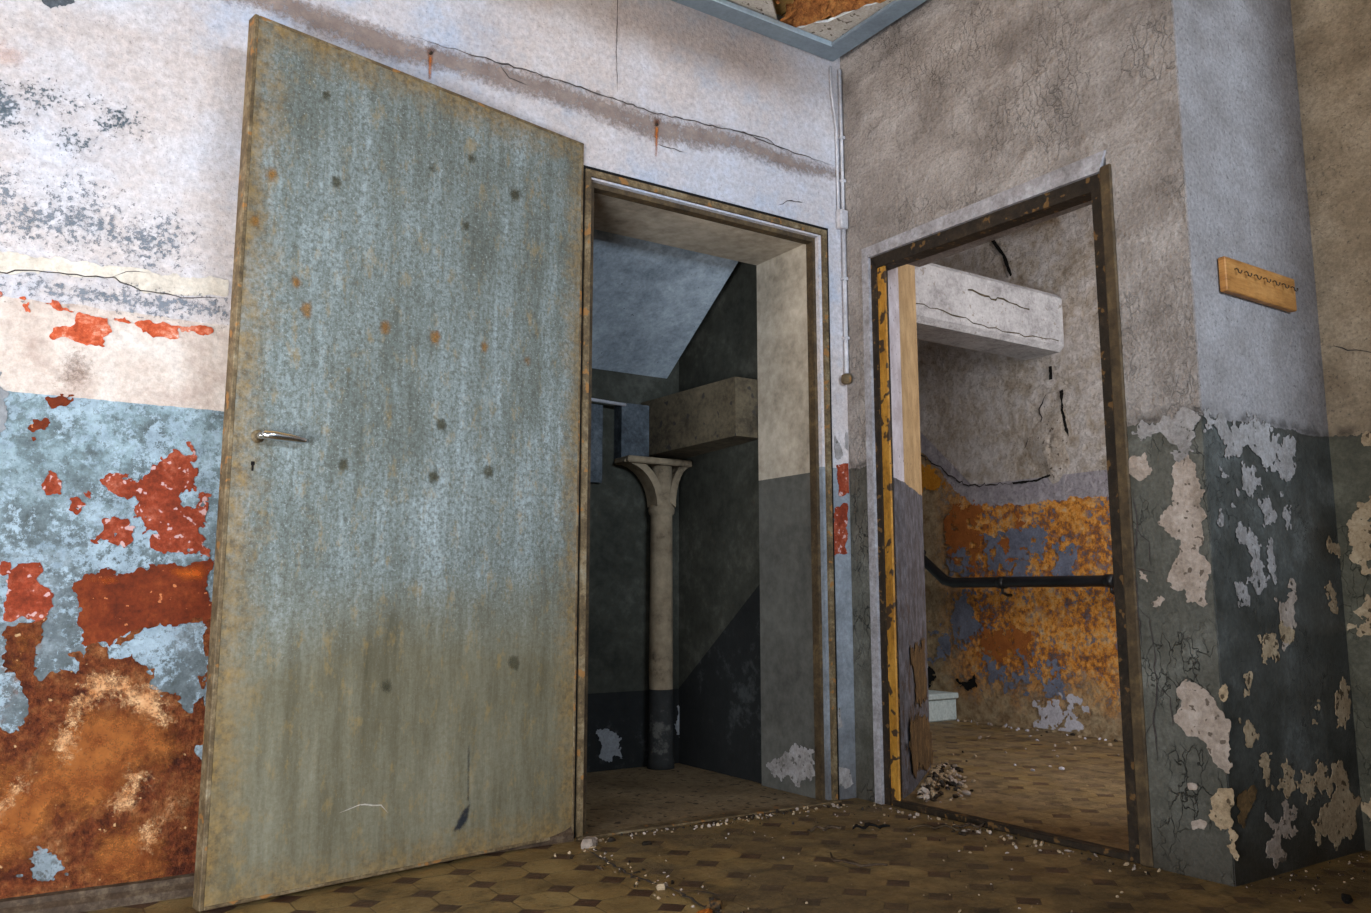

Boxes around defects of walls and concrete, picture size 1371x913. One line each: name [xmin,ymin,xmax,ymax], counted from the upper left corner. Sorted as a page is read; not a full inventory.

crack [414,0,834,166]
crack [0,269,213,298]
peeling [0,251,229,297]
peeling [46,299,213,347]
crack [916,240,1069,487]
peeling [834,432,849,555]
peeling [921,464,946,493]
peeling [0,441,215,899]
peeling [909,500,1089,779]
peeling [1129,407,1371,869]
peeling [596,728,622,762]
peeling [766,743,815,787]